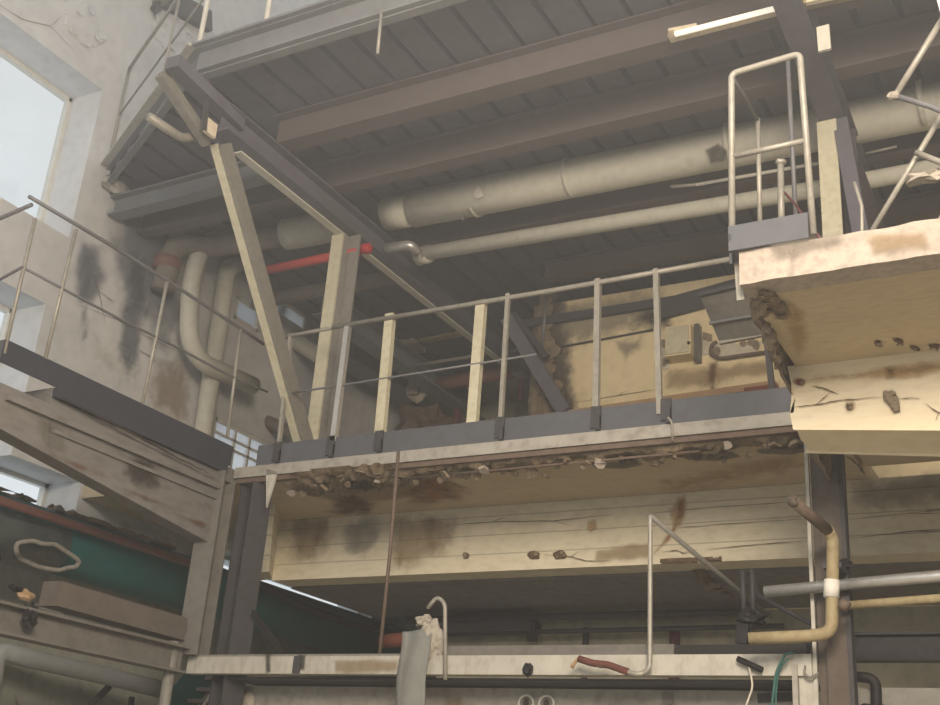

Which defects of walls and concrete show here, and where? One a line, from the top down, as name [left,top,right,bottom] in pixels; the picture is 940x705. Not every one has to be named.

damp [79,246,102,299]
damp [121,218,177,365]
spalling [702,289,804,394]
crack [787,386,940,419]
spalling [281,434,832,498]
rust [664,499,685,543]